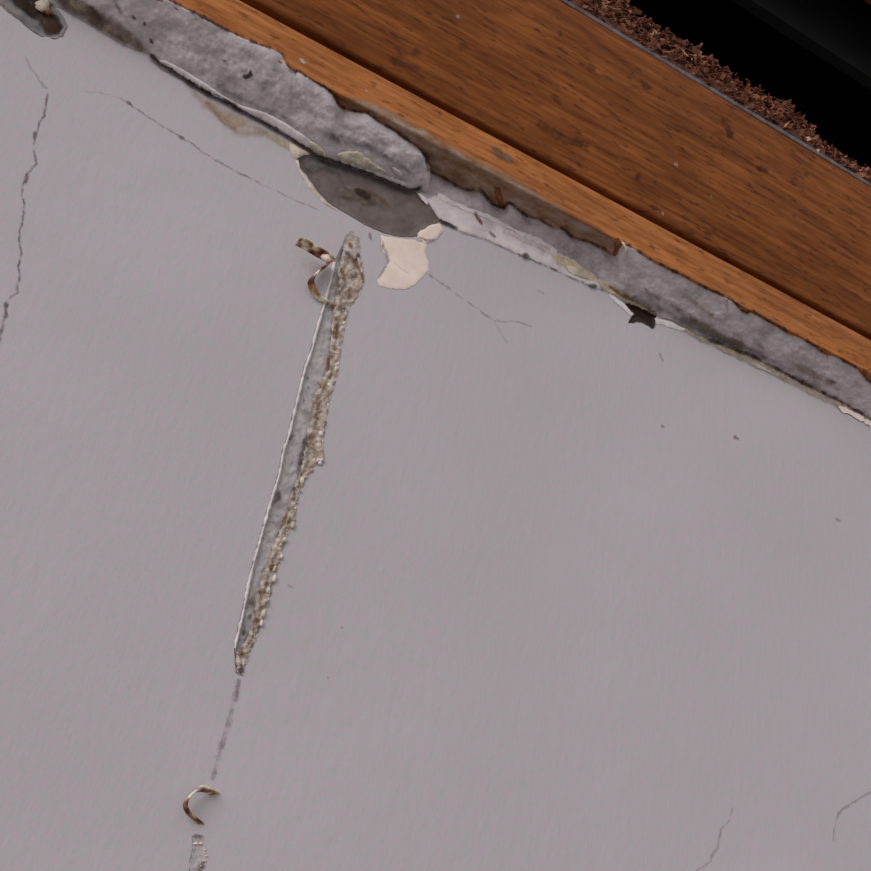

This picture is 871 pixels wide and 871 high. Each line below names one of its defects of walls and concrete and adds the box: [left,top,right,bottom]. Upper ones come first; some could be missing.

crack [0,96,48,339]
crack [150,53,422,191]
spalling [159,60,685,331]
spalling [236,232,364,675]